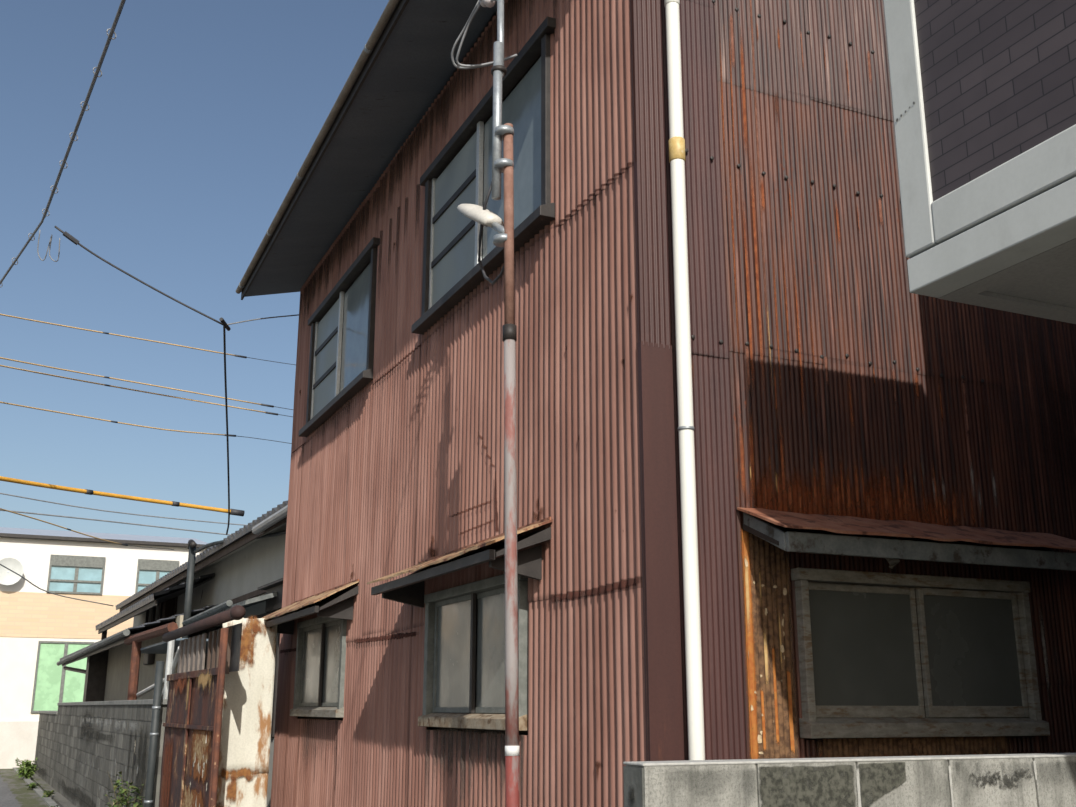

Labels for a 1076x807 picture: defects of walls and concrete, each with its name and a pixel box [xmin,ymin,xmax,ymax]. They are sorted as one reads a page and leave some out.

corrosion [721,0,828,412]
corrosion [740,424,984,526]
corrosion [240,616,272,666]
corrosion [161,741,173,807]
corrosion [216,768,257,807]